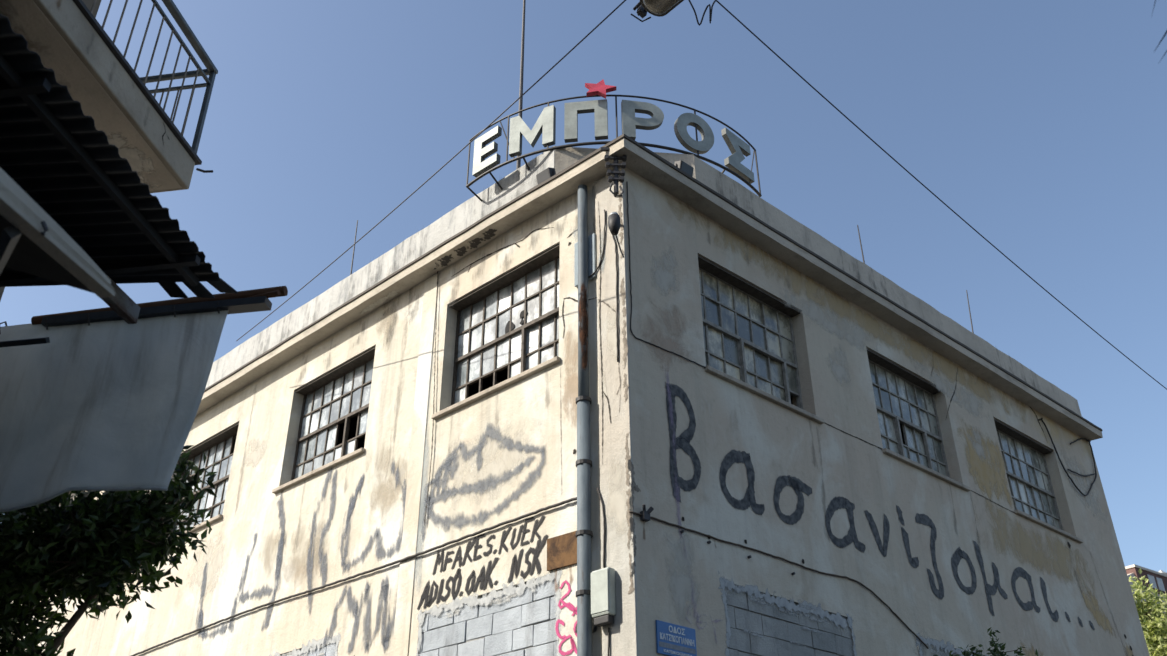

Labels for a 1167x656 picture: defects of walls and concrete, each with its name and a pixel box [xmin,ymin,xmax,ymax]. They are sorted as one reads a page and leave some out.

rust [578,283,588,370]